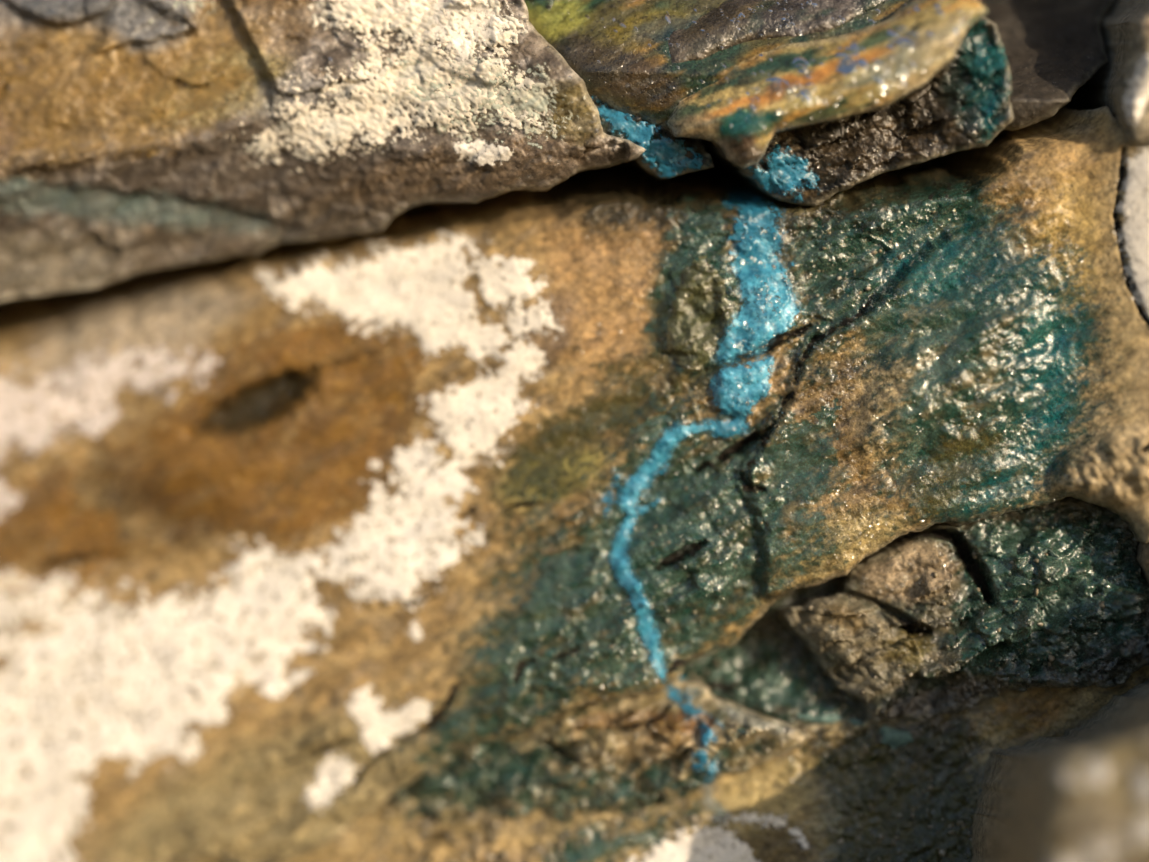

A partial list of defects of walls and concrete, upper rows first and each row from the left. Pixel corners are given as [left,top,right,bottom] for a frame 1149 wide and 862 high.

crack [696,301,873,492]
crack [655,539,709,571]